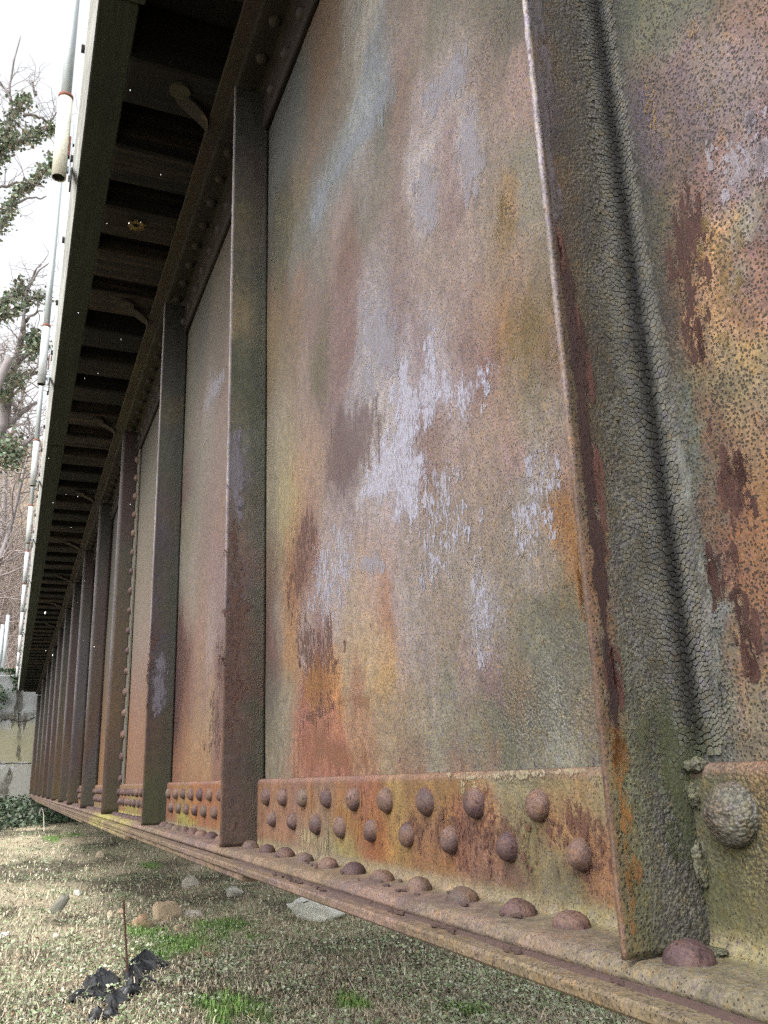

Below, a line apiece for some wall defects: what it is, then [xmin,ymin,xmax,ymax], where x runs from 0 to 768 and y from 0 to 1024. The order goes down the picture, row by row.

corrosion [665,173,716,366]
corrosion [534,0,642,935]
crack [575,0,733,794]
corrosion [715,444,758,524]
corrosion [204,519,252,757]
corrosion [286,508,369,725]
corrosion [698,538,762,683]
corrosion [395,785,612,881]